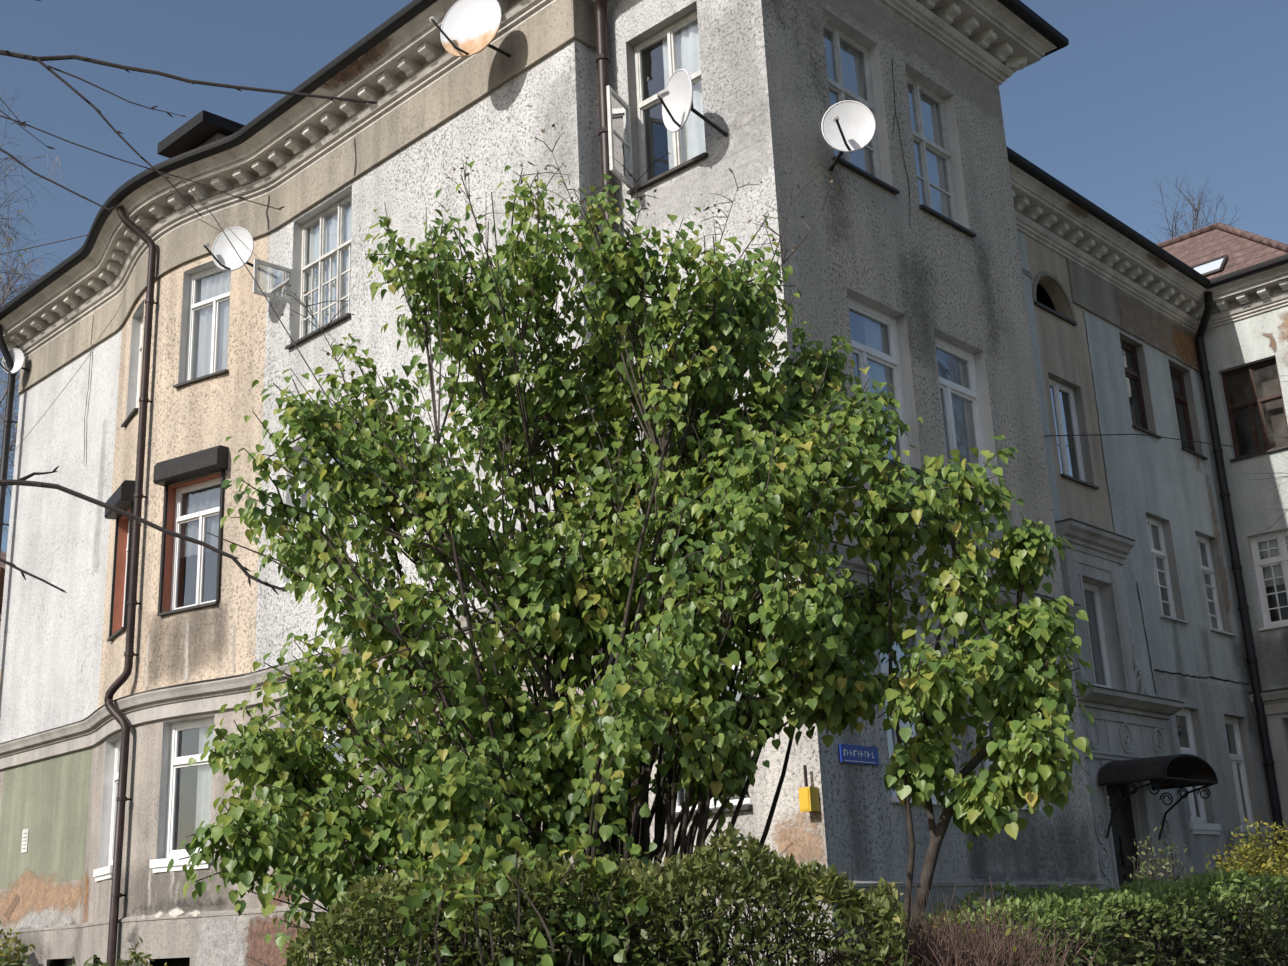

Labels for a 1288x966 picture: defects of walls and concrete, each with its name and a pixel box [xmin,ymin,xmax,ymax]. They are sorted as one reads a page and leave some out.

flaking render [1263,313,1288,363]
peeling [0,871,89,925]